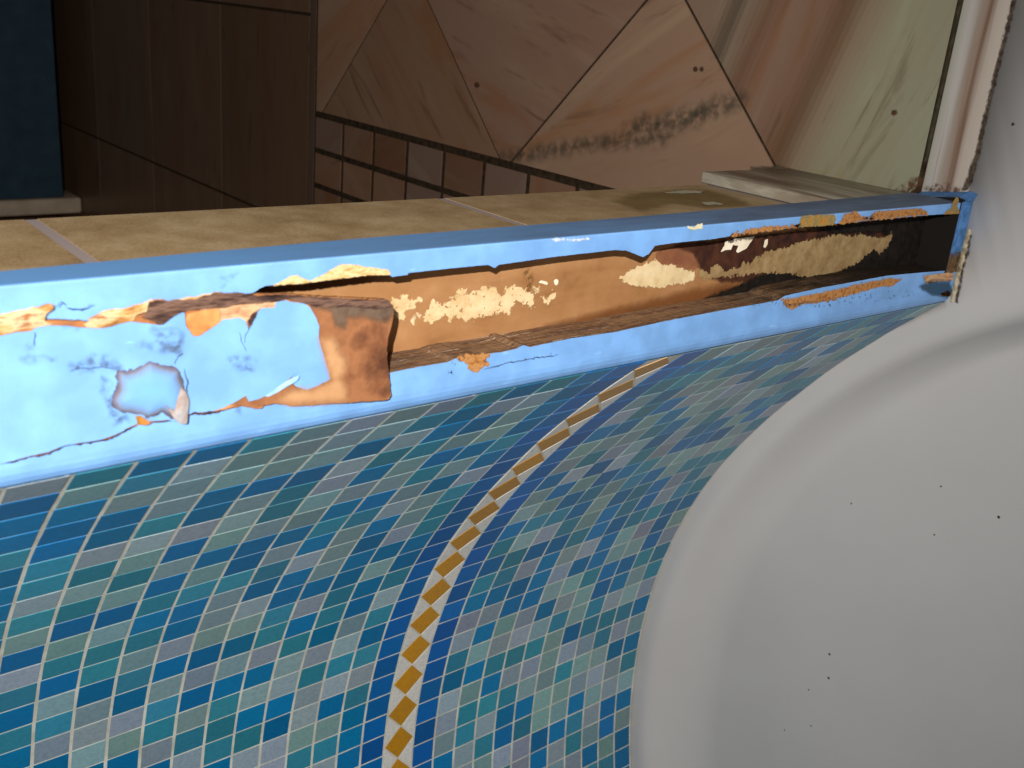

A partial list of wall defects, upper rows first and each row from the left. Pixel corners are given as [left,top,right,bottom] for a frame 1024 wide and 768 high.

peeling [945,197,960,215]
peeling [731,208,928,248]
peeling [532,279,558,305]
peeling [781,277,902,309]
peeling [924,273,954,284]
peeling [186,302,276,336]
peeling [215,300,394,411]
peeling [457,352,490,372]
crack [6,353,224,463]